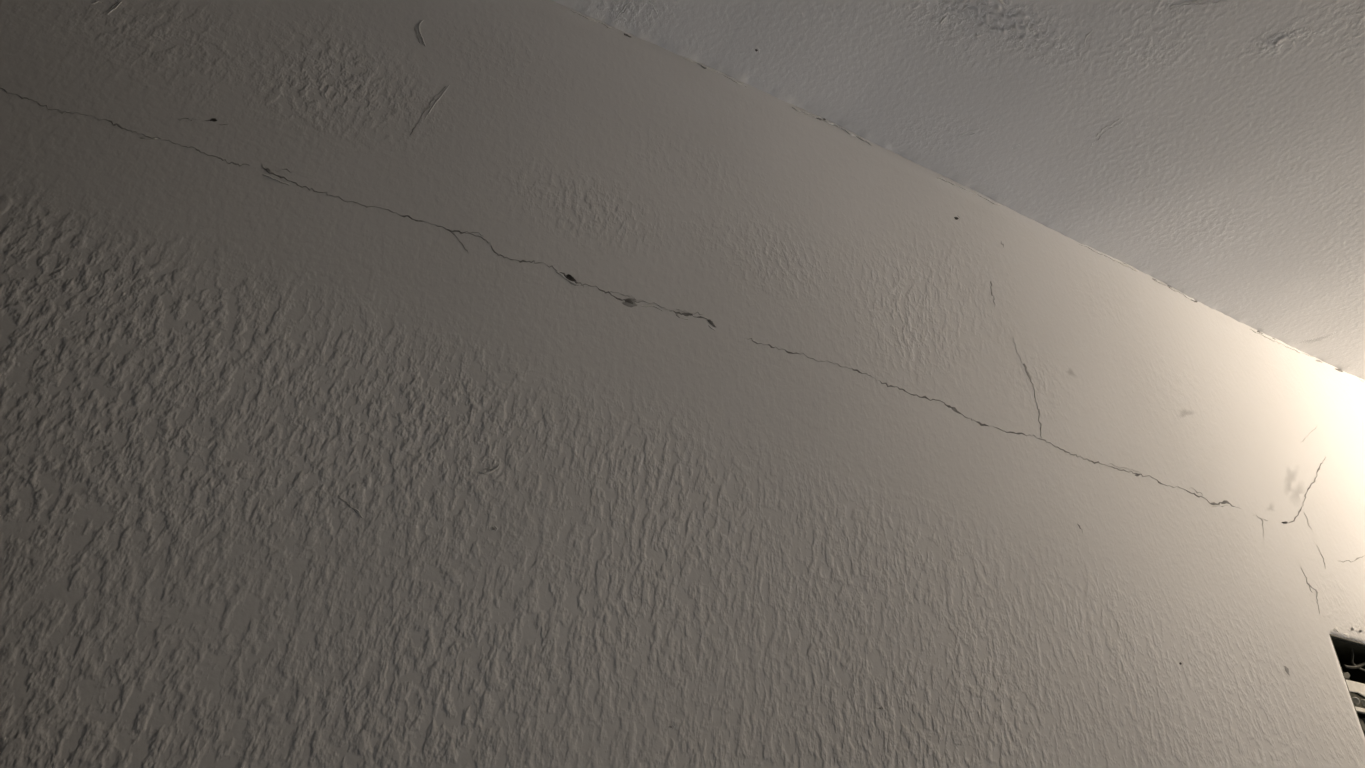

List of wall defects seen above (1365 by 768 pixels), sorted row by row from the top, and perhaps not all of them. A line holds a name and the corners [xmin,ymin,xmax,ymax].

crack [1,88,1365,613]